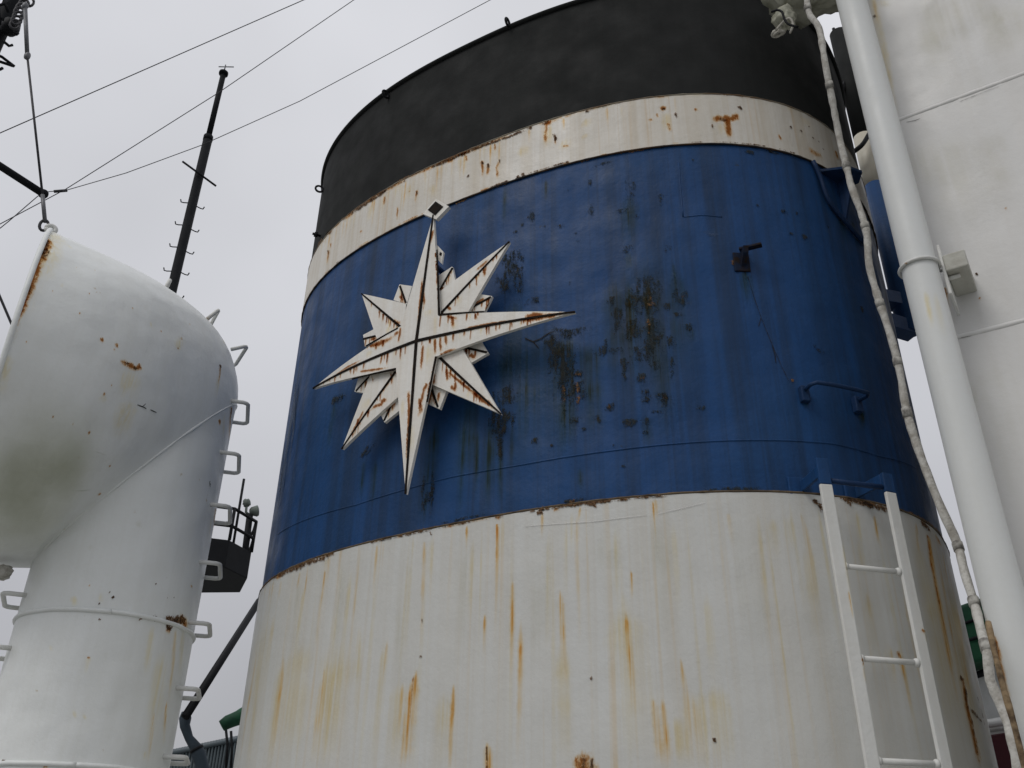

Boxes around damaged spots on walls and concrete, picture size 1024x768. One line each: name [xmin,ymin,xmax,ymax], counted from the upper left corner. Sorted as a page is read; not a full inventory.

rust [711,96,765,147]
rust [318,121,588,263]
rust [21,239,52,315]
rust [530,495,667,515]
rust [840,497,887,512]
rust [156,614,187,632]
rust [960,675,985,754]